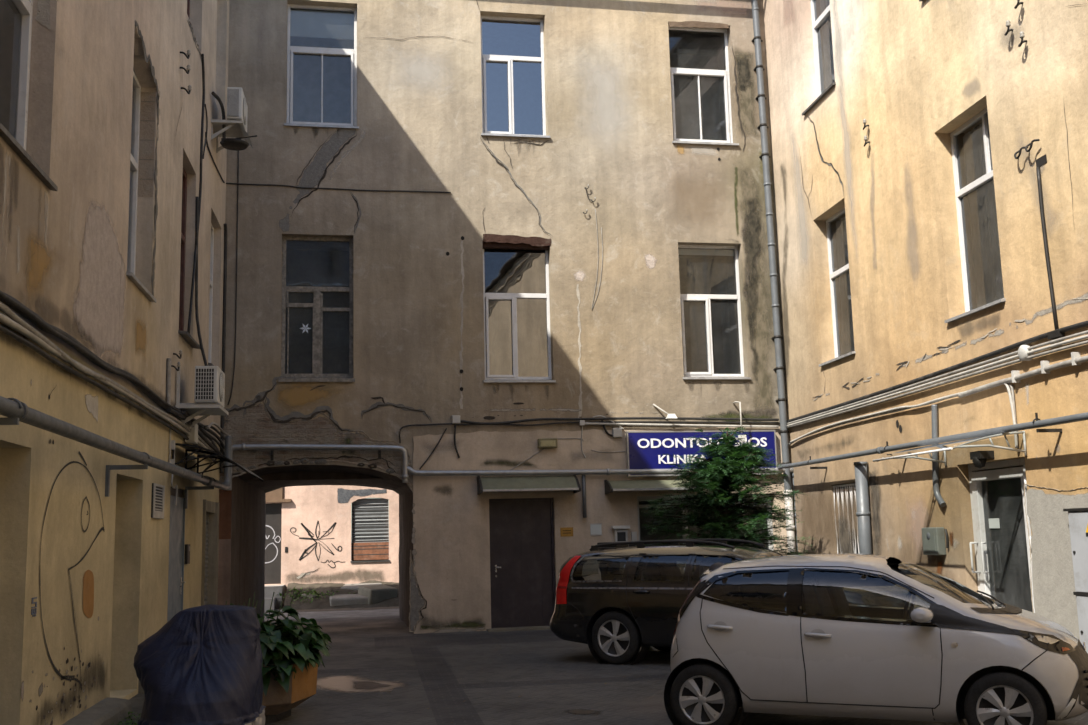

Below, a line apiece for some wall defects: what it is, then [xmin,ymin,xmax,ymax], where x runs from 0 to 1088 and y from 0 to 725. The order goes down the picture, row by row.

crack [367,35,474,43]
damp [735,52,756,135]
crack [350,191,361,232]
crack [480,135,551,236]
crack [798,115,844,211]
spalling [73,202,125,357]
damp [708,170,776,424]
spalling [896,293,1088,371]
spalling [219,400,413,489]
crack [226,376,432,473]
spalling [409,503,427,632]